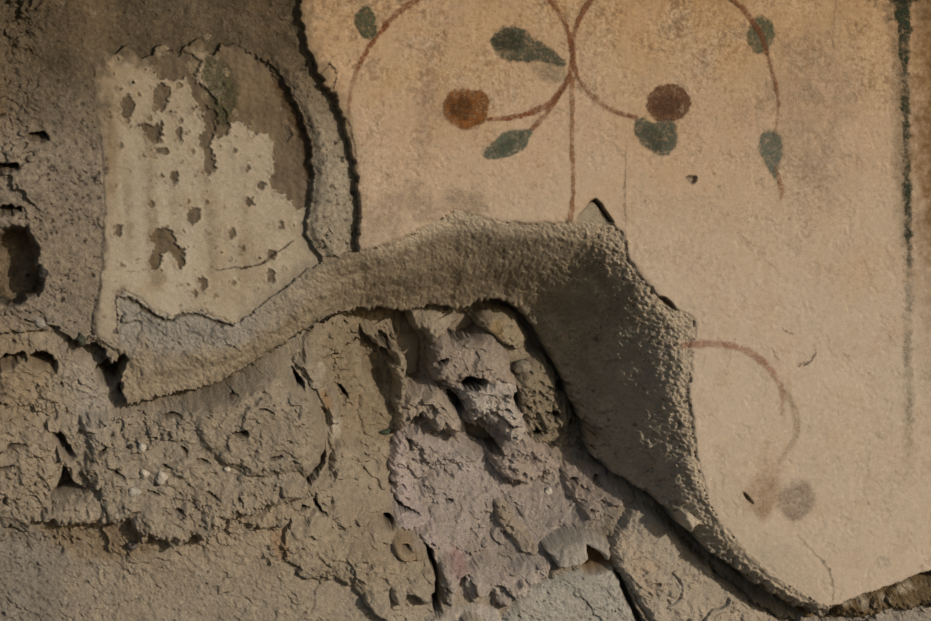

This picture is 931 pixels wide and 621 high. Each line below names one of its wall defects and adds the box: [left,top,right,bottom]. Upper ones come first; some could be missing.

flaking render [107,45,314,210]
flaking render [148,199,209,270]
flaking render [187,276,208,300]
flaking render [266,250,277,285]
spalling [0,350,59,376]
spalling [94,354,129,403]
spalling [0,402,109,527]
spalling [258,299,931,621]